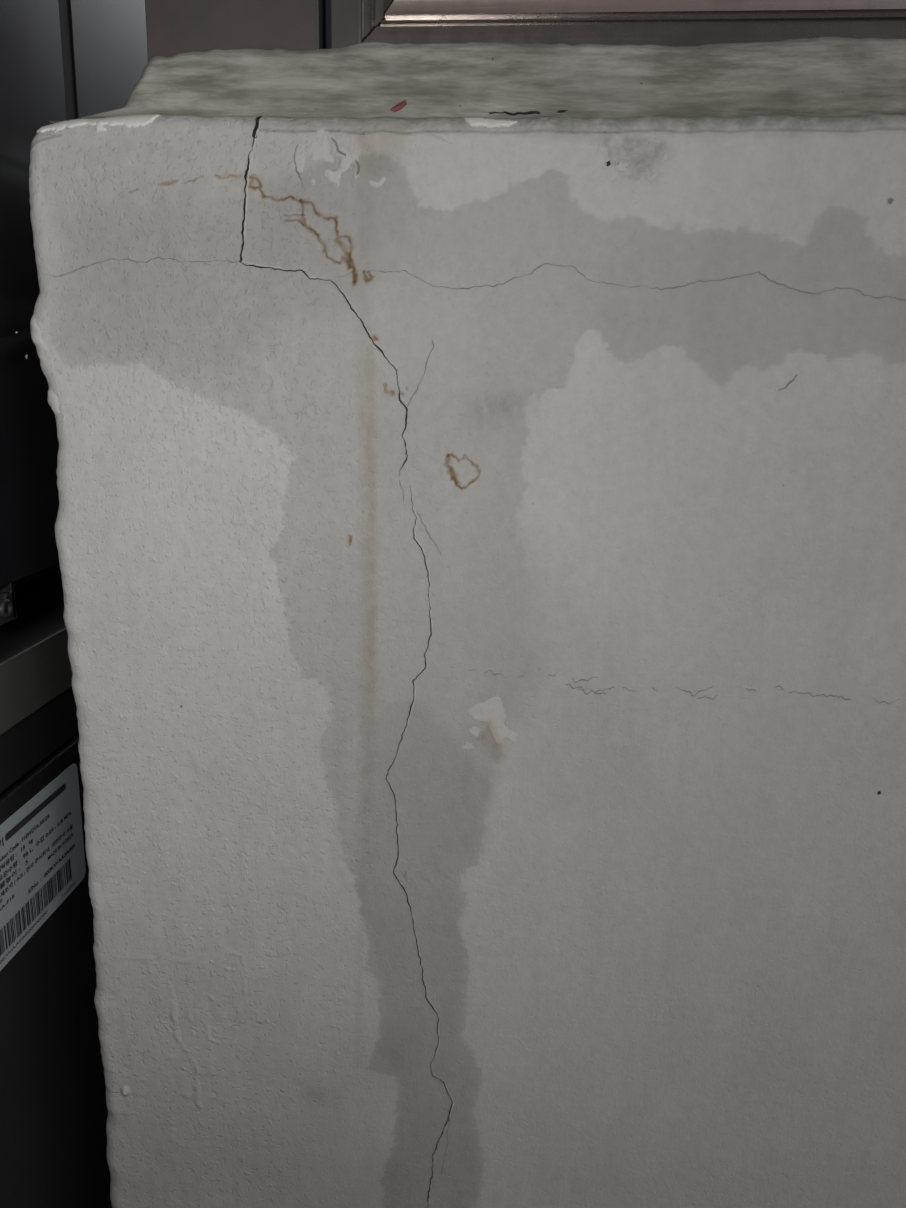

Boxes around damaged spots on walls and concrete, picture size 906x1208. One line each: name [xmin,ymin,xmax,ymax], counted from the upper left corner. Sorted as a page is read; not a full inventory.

crack [489,109,568,117]
crack [379,263,906,300]
crack [46,115,455,1208]
crack [450,666,850,700]
peeling [462,696,518,750]